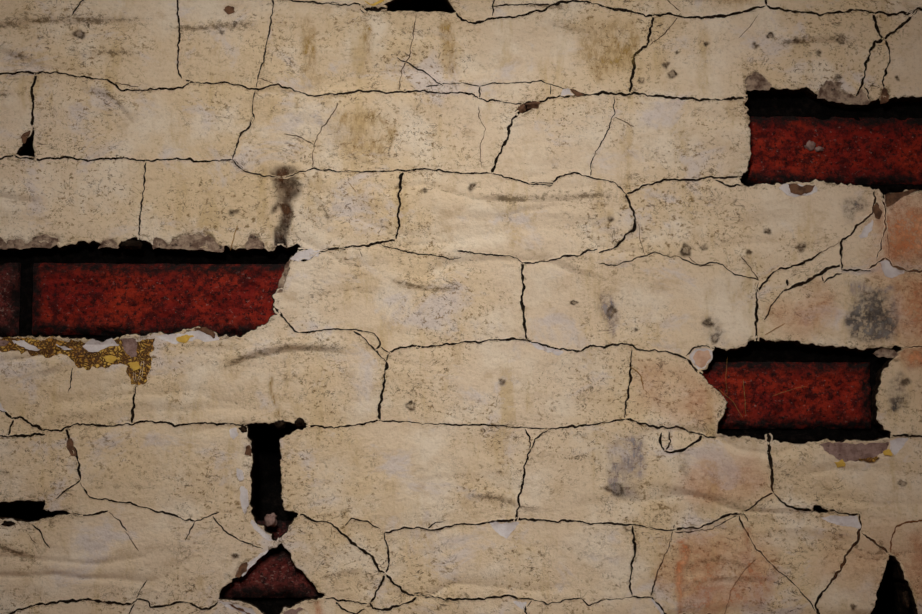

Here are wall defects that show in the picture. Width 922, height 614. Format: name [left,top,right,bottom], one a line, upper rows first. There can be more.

crack [0,0,577,130]
crack [455,0,922,103]
spalling [0,234,320,385]
damp [272,166,298,250]
crack [0,99,743,430]
spalling [737,72,922,238]
mould [845,292,897,341]
crack [0,357,263,551]
spalling [215,417,328,614]
crack [297,350,922,614]
spalling [689,320,908,468]
spalling [868,552,921,614]